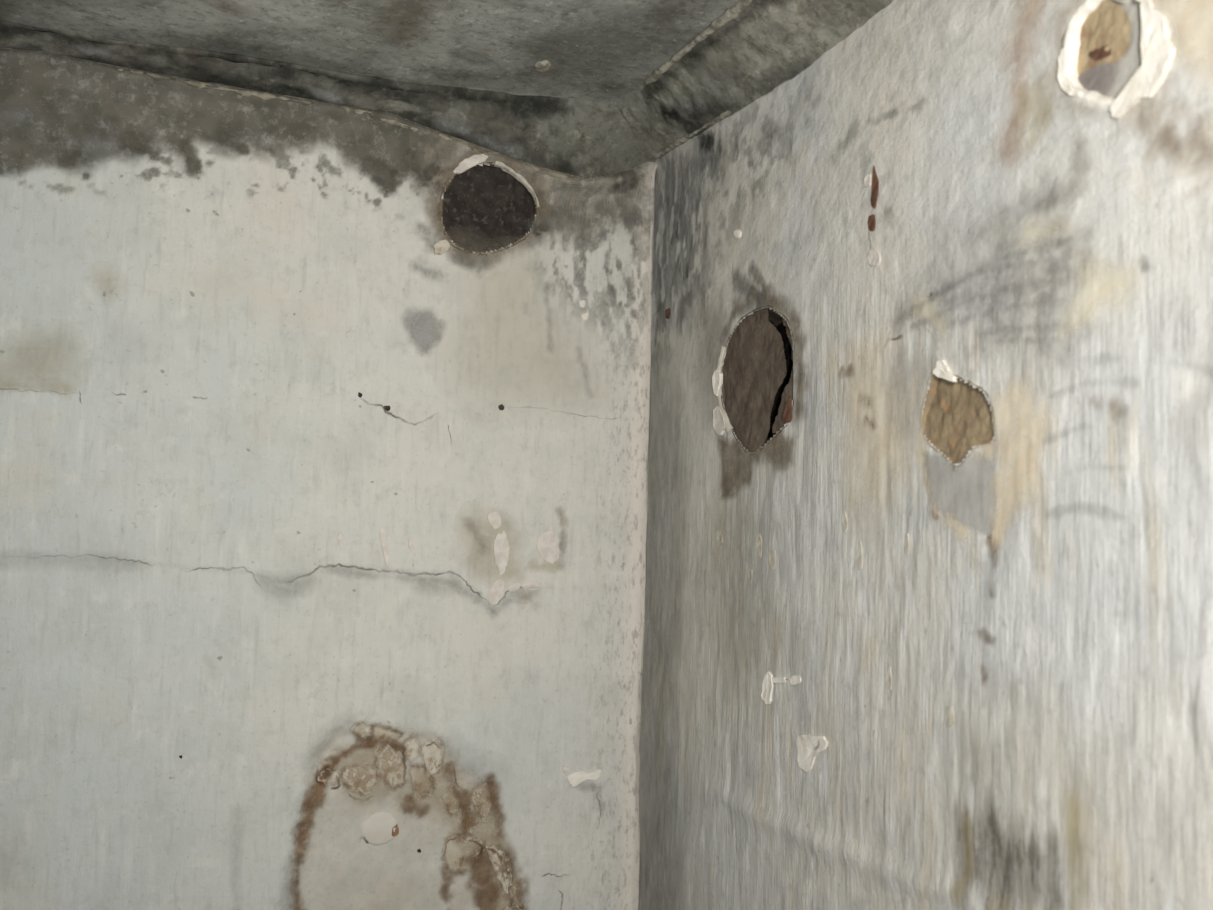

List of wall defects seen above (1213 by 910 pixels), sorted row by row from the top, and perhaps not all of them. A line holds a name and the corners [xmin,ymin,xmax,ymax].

peeling [1058,48,1081,96]
peeling [1109,0,1176,118]
leakage [0,26,644,259]
peeling [933,359,957,382]
peeling [487,512,543,604]
peeling [537,526,560,564]
peeling [761,672,801,704]
peeling [796,734,828,772]
spalling [293,721,522,910]